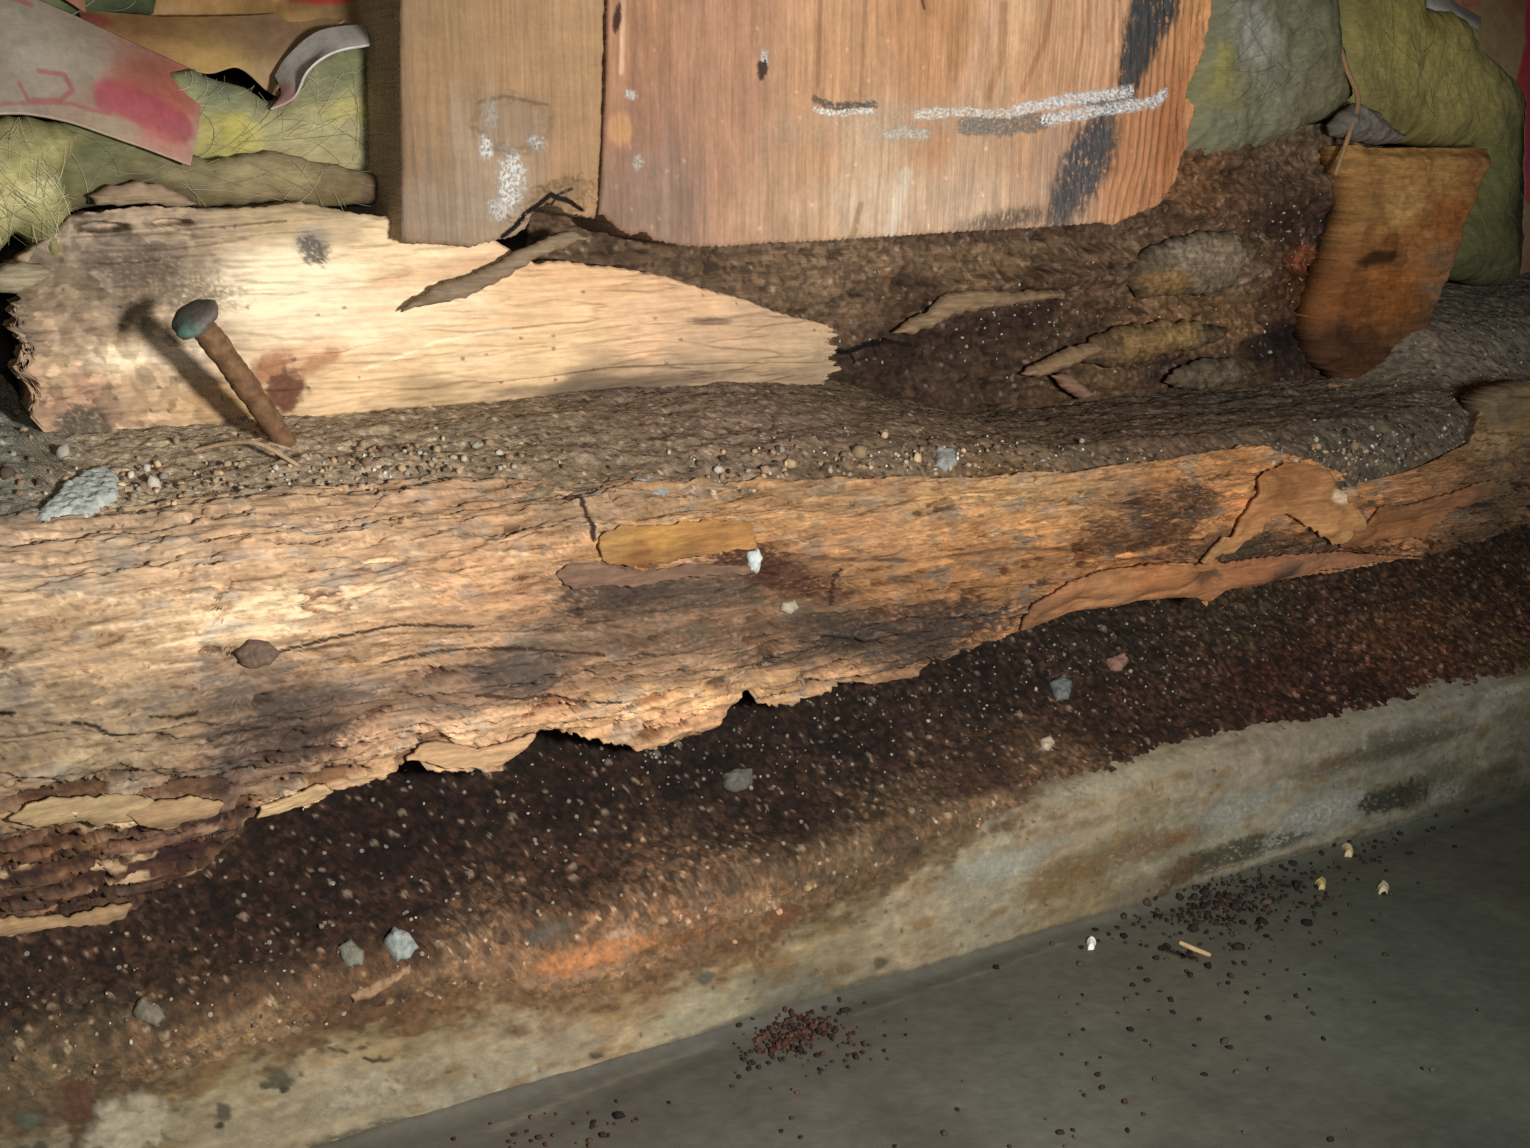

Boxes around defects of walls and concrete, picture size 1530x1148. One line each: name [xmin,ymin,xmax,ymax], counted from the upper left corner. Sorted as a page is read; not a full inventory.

peeling [405,732,536,769]
peeling [8,793,224,831]
peeling [255,782,334,819]
water stain [1159,776,1458,896]
water stain [261,1070,292,1093]
water stain [216,1104,230,1128]